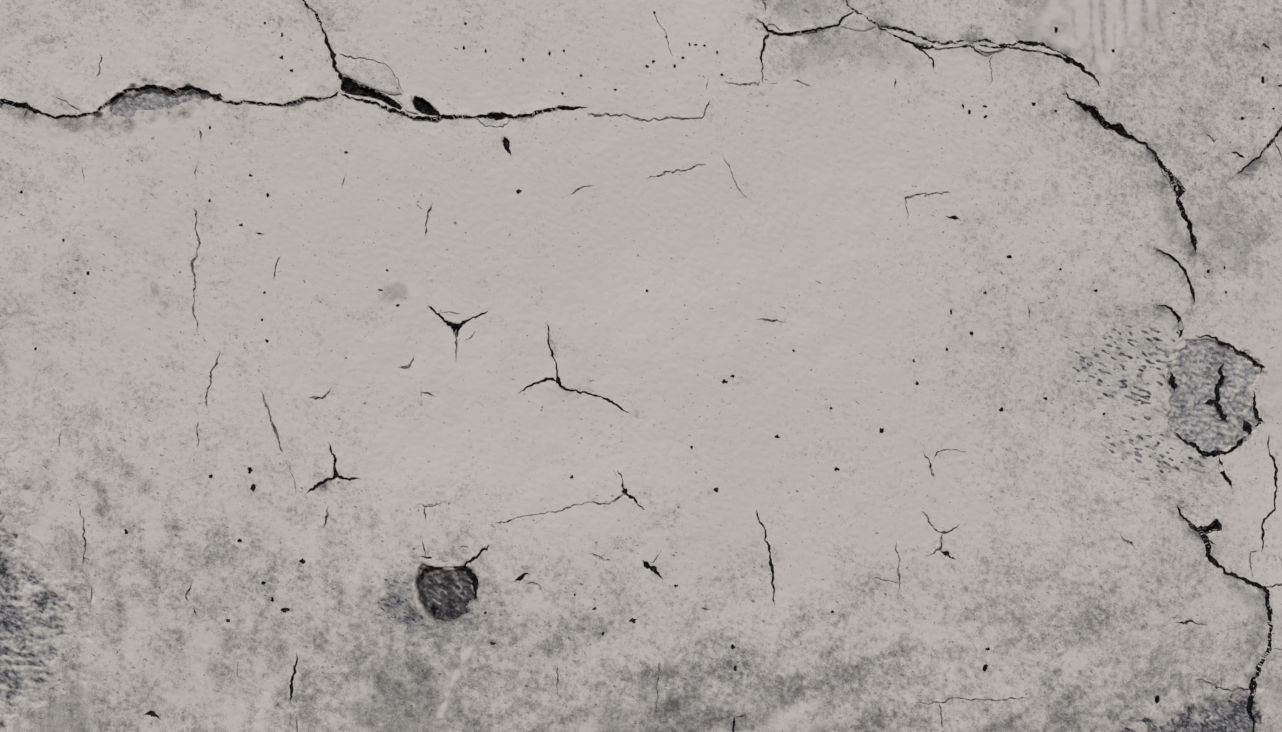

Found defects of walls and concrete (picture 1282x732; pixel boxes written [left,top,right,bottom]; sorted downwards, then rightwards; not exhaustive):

crack [0,0,1198,337]
crack [196,354,220,446]
crack [401,357,433,396]
crack [429,306,486,362]
crack [519,323,631,414]
peeling [1166,334,1265,457]
crack [262,393,360,528]
crack [496,471,643,523]
peeling [0,435,91,732]
spalling [416,542,489,621]
crack [1177,437,1282,732]